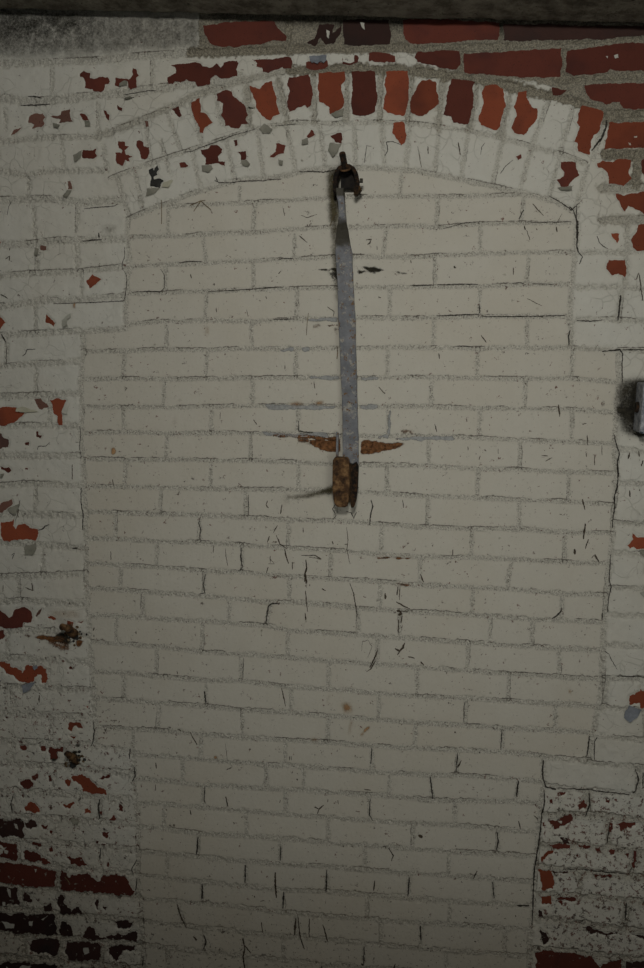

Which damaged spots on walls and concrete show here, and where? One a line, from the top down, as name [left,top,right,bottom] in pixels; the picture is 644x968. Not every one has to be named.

peeling [80,68,139,92]
peeling [115,140,173,196]
peeling [167,19,644,251]
rust [273,434,340,452]
rust [361,430,411,454]
crack [612,436,620,528]
crack [602,554,612,620]
rust [25,635,83,650]
peeling [0,772,138,968]
crack [517,760,644,925]
peeling [538,800,637,917]
peeling [535,929,644,968]